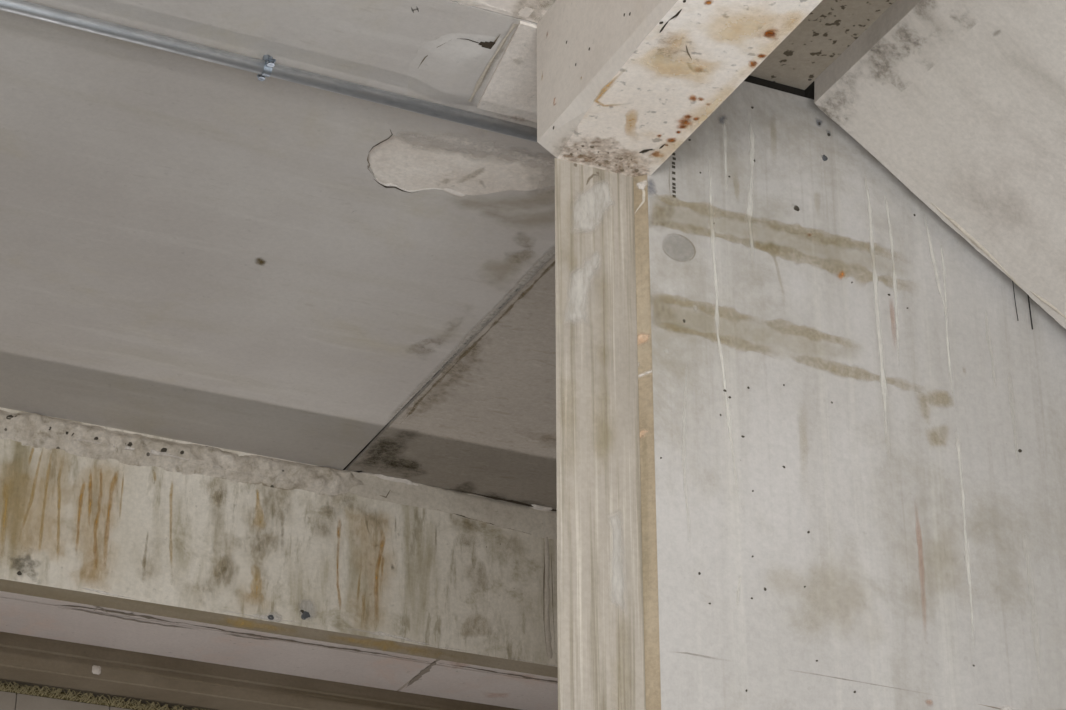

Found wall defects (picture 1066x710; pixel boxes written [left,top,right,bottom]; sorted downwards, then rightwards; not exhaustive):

spalling [367,130,555,197]
leakage [709,180,731,433]
leakage [867,189,887,420]
crack [60,605,558,683]
crack [543,553,555,648]